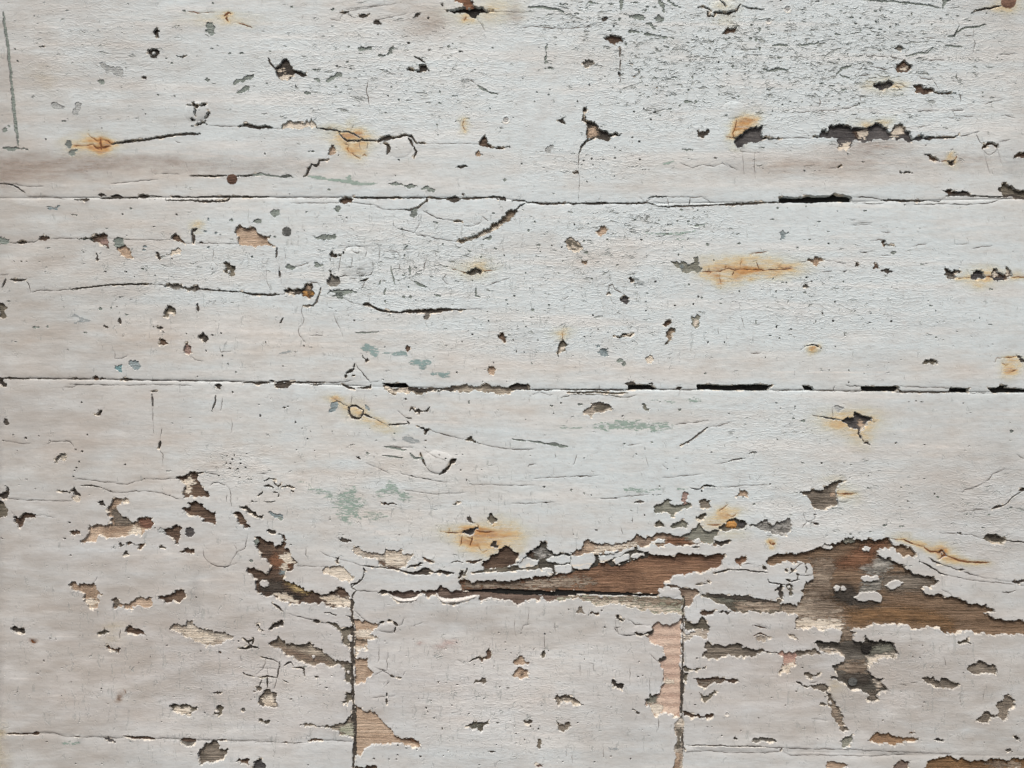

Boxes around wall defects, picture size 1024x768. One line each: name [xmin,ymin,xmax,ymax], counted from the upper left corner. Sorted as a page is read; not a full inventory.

rust [72,135,114,154]
rust [726,117,758,139]
peeling [813,124,953,166]
crack [2,274,163,292]
crack [187,211,509,336]
rust [701,251,795,284]
peeling [64,472,217,555]
rust [888,538,989,565]
peeling [70,581,197,609]
peeling [234,500,422,768]
crack [273,552,539,704]
peeling [387,486,1024,768]